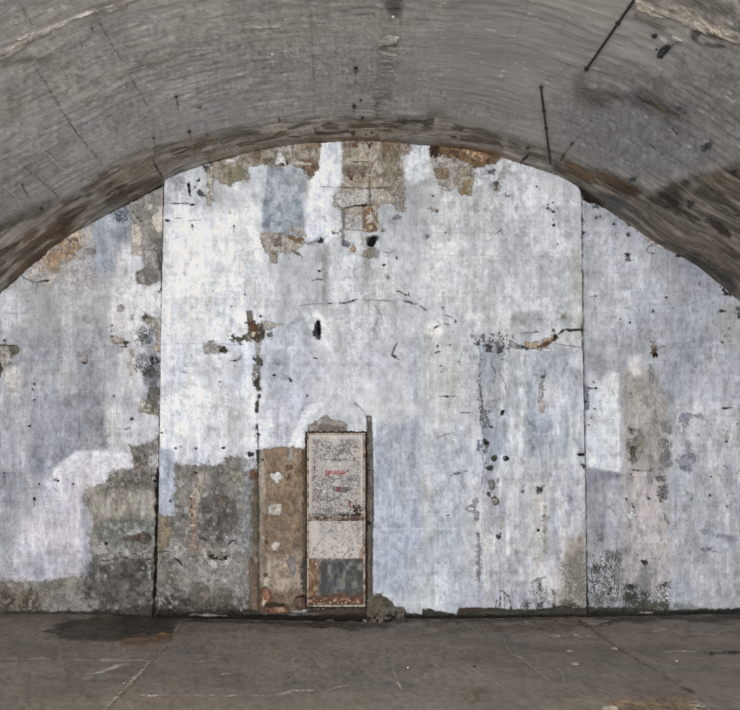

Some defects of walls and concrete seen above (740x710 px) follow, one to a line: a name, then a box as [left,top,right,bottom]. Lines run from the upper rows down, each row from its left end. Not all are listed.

peeling [26,224,96,293]
peeling [129,142,324,285]
peeling [332,140,411,247]
peeling [429,145,503,197]
spalling [203,310,283,410]
crack [527,195,621,631]
peeling [0,436,307,616]
leakage [0,550,740,644]